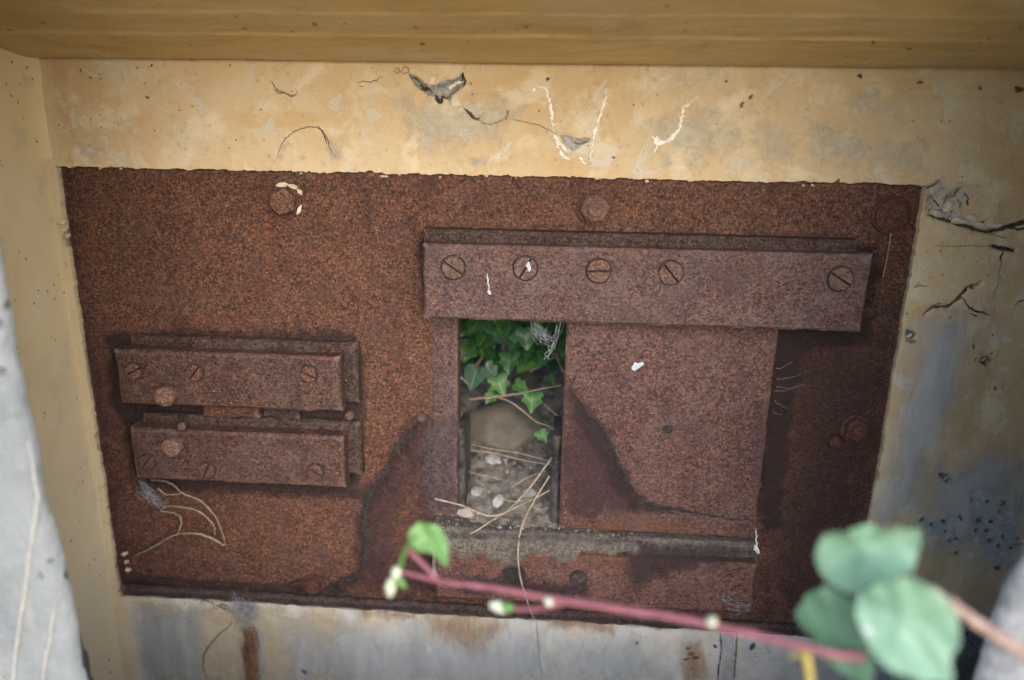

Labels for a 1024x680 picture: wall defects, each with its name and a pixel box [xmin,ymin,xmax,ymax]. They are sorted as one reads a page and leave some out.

crack [278,125,340,159]
peeling [404,72,500,151]
crack [464,108,555,133]
spalling [560,135,590,150]
spalling [924,180,994,226]
crack [914,214,1024,317]
corrosion [162,329,356,341]
corrosion [566,247,881,599]
corrosion [93,334,456,595]
leakage [936,463,1020,554]
corrosion [461,578,586,595]
corrosion [242,627,258,680]